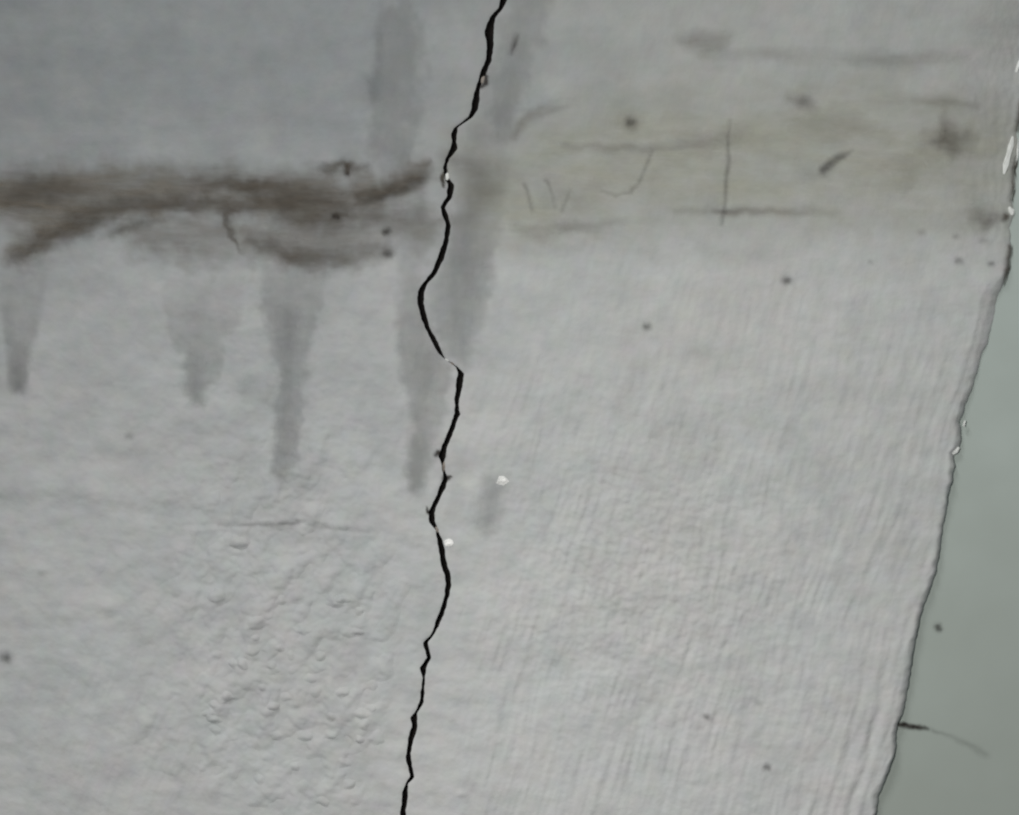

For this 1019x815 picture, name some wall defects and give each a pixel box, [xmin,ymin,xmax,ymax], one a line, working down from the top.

crack [400,0,507,815]